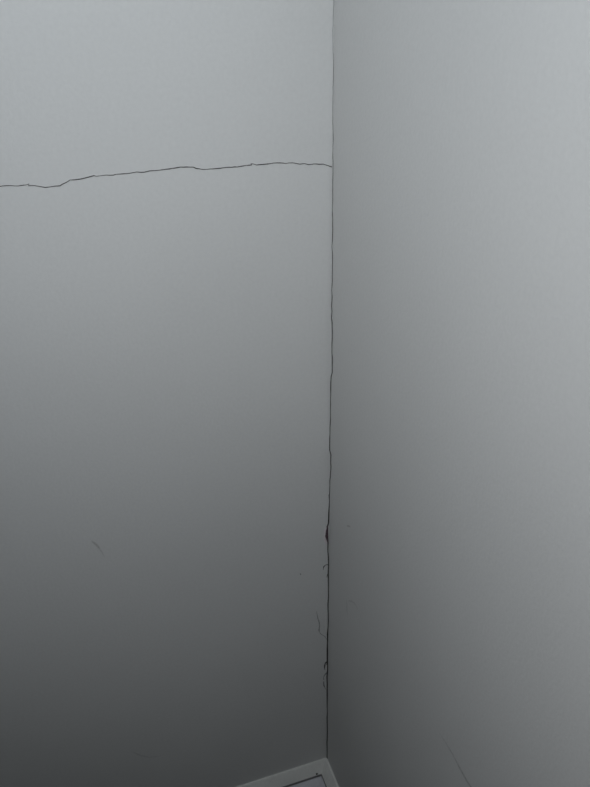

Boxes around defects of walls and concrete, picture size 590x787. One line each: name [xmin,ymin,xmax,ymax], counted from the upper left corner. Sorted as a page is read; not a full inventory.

crack [0,162,333,759]